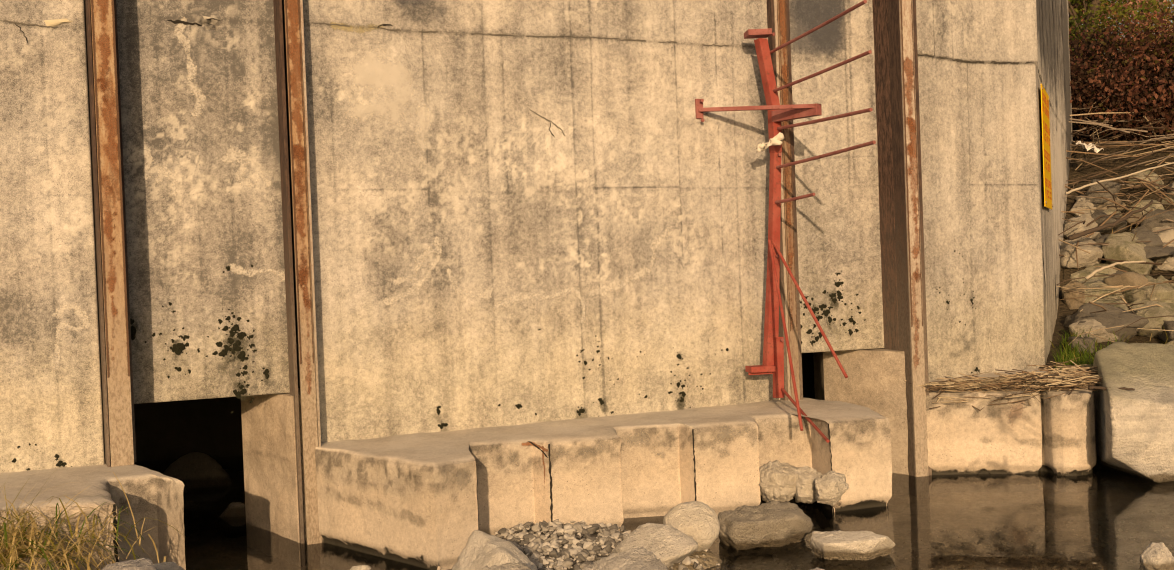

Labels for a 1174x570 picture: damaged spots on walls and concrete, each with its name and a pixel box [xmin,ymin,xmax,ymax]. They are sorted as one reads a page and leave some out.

rust [91,0,130,378]
rust [285,0,314,394]
rust [900,0,923,365]